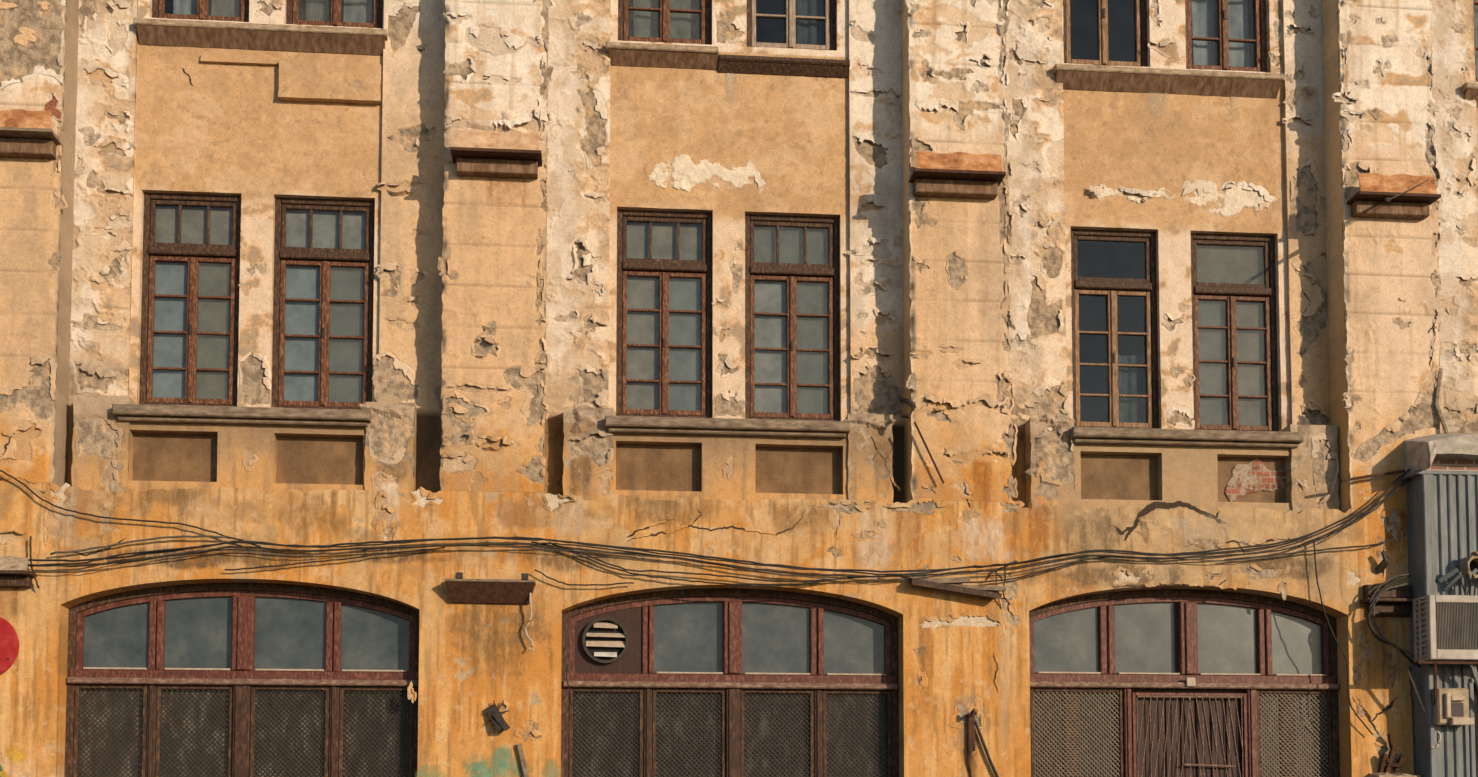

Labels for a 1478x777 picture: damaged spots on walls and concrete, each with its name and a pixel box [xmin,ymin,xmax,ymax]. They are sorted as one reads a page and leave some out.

spalling [0,0,136,291]
spalling [388,1,428,54]
spalling [848,0,1064,351]
spalling [1332,0,1397,204]
peeling [1415,48,1478,316]
spalling [0,352,118,466]
spalling [367,351,443,545]
peeling [375,248,458,327]
crack [627,508,806,541]
spalling [818,138,1074,557]
crack [1113,501,1305,590]
spalling [1182,158,1478,505]